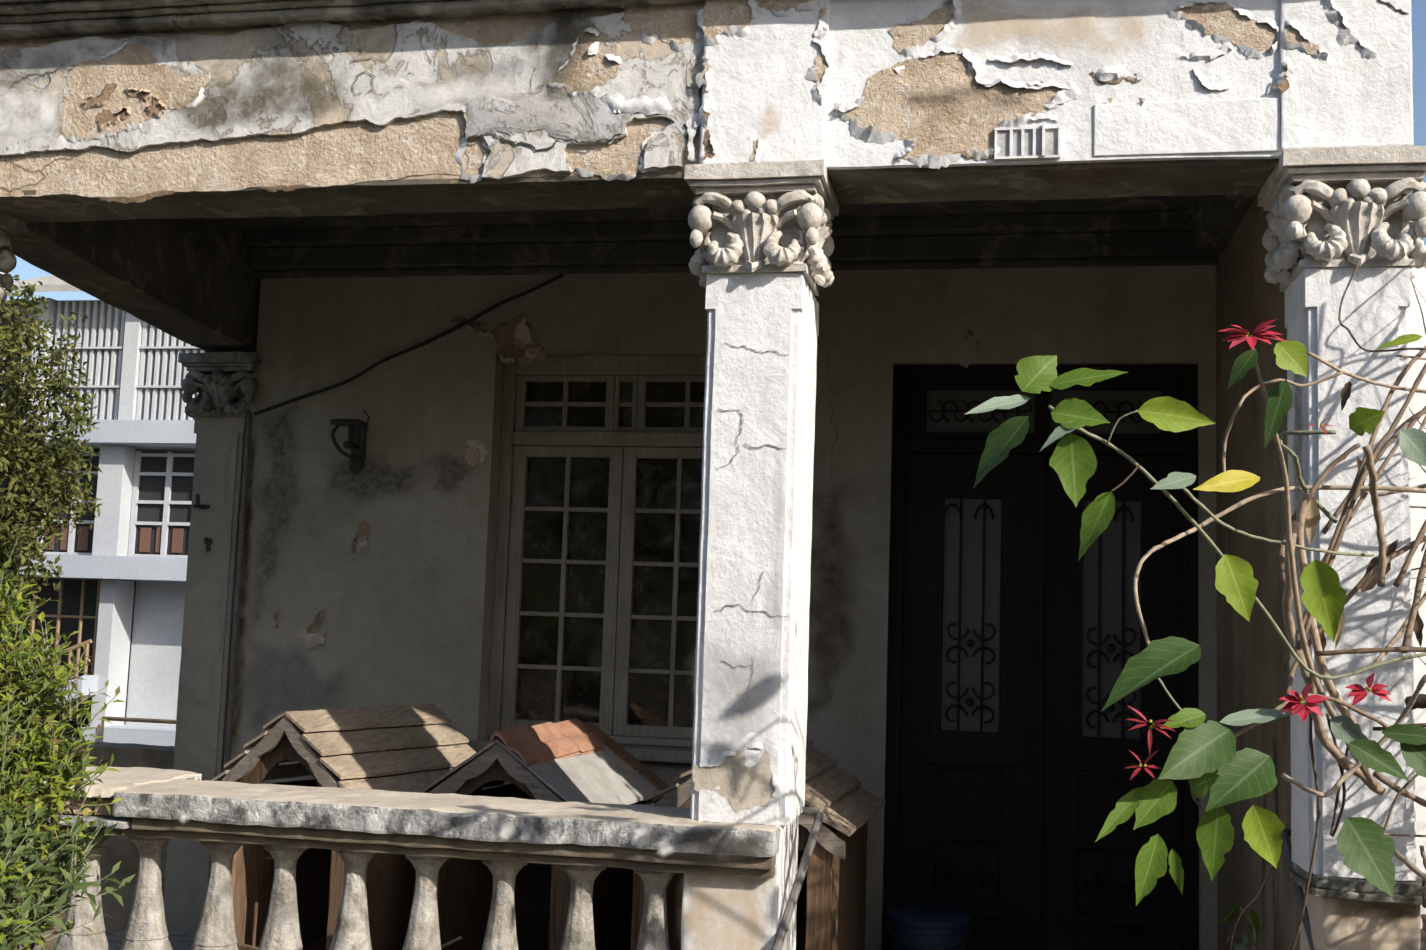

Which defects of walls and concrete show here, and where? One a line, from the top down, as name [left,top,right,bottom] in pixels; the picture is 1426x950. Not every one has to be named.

peeling [547,27,622,97]
peeling [621,0,1082,169]
peeling [1166,0,1376,92]
spalling [0,42,491,204]
spalling [564,118,675,181]
crack [724,342,789,356]
crack [716,409,788,469]
crack [715,571,789,618]
peeling [692,749,782,813]